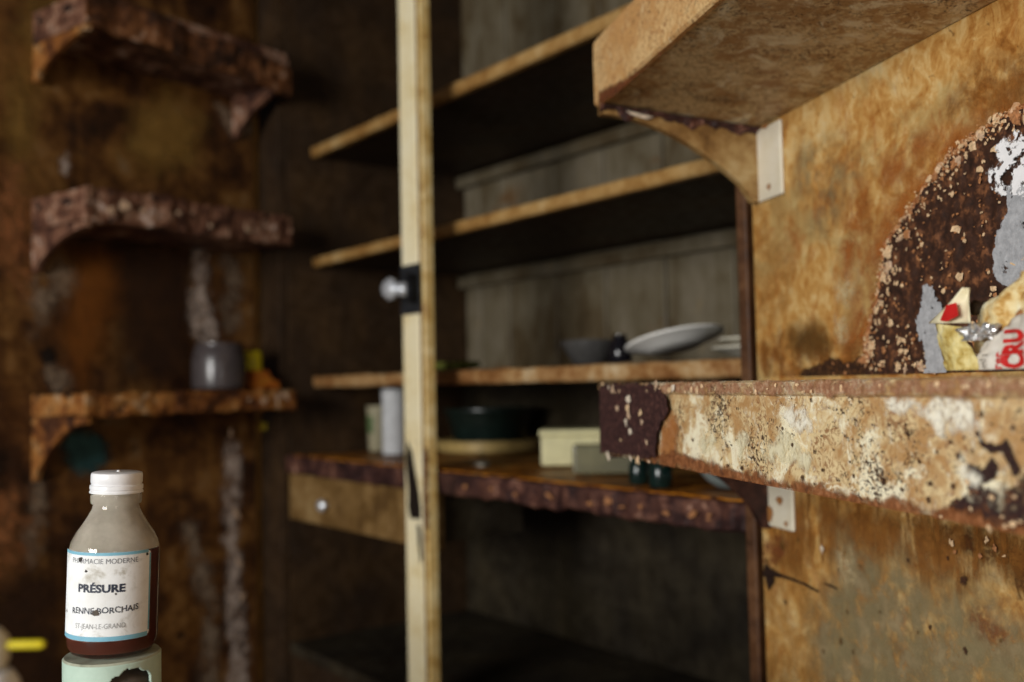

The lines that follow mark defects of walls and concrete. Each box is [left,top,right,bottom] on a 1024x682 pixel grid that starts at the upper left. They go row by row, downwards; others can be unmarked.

rust [799,67,1024,376]
rust [763,493,1024,596]